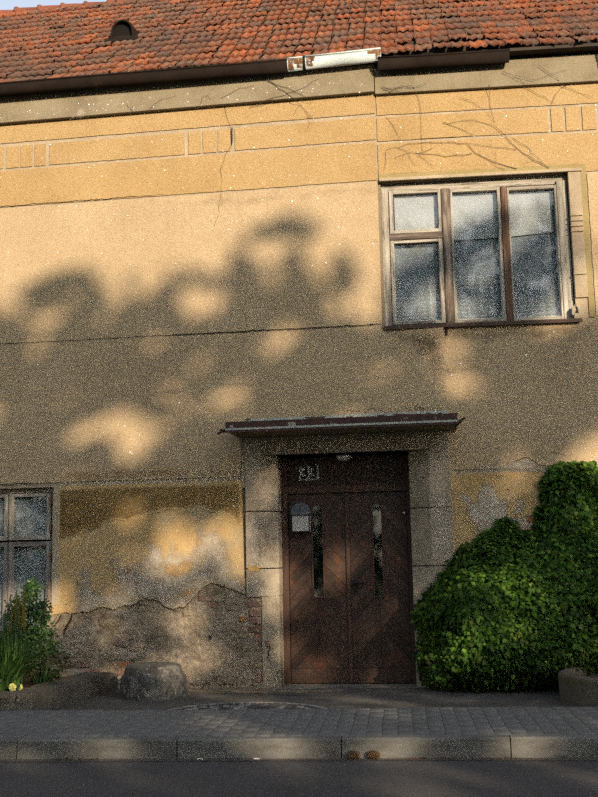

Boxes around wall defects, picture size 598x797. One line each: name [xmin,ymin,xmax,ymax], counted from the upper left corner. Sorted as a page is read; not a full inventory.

peeling [59,485,239,540]
peeling [460,459,547,545]
spalling [47,528,270,688]